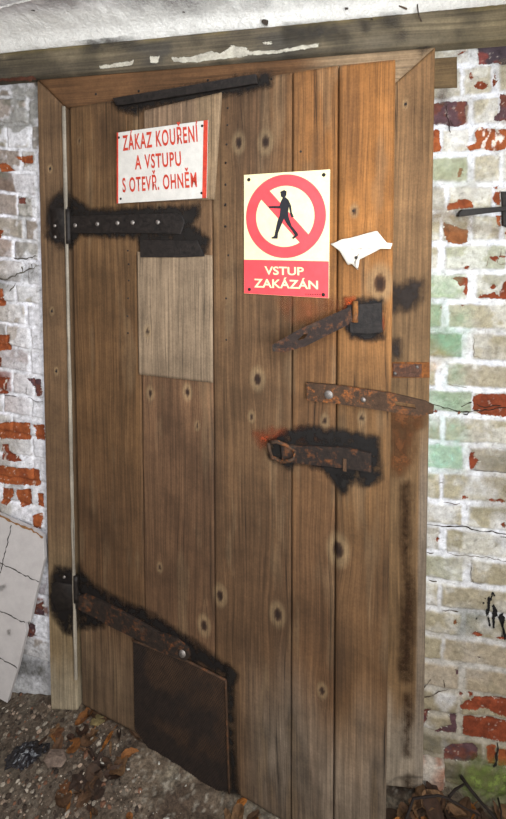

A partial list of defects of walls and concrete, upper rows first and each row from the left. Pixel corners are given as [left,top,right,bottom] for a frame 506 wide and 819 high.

peeling [458,46,506,152]
peeling [433,100,469,153]
peeling [442,223,469,245]
peeling [453,266,469,294]
peeling [478,281,506,300]
peeling [0,334,12,367]
peeling [27,377,43,396]
crack [434,384,506,415]
peeling [472,393,506,418]
peeling [0,422,45,530]
crack [428,524,506,538]
peeling [435,690,506,767]